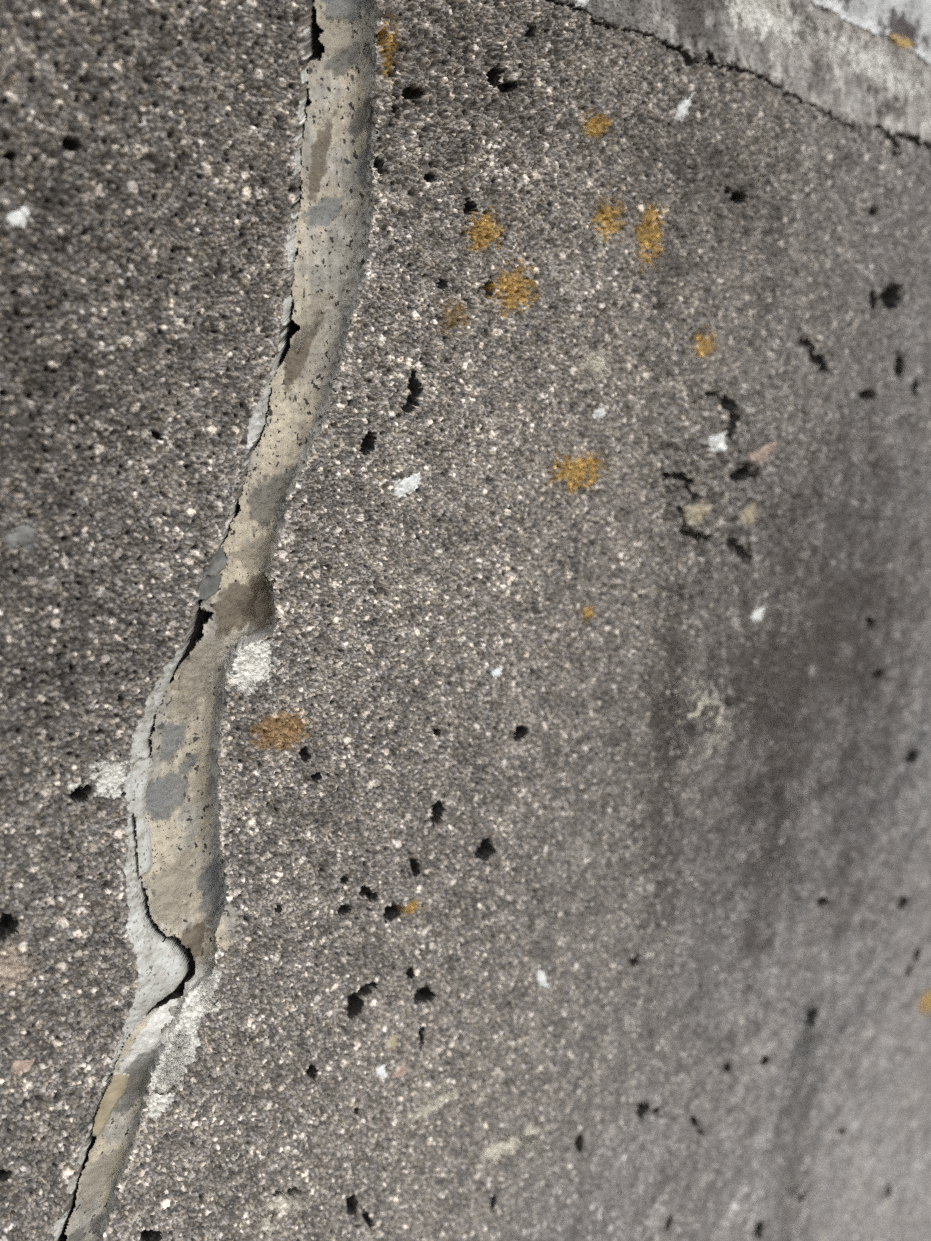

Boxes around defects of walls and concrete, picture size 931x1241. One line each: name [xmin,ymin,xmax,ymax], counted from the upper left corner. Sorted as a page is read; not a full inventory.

crack [53,0,385,1241]
crack [545,0,931,165]